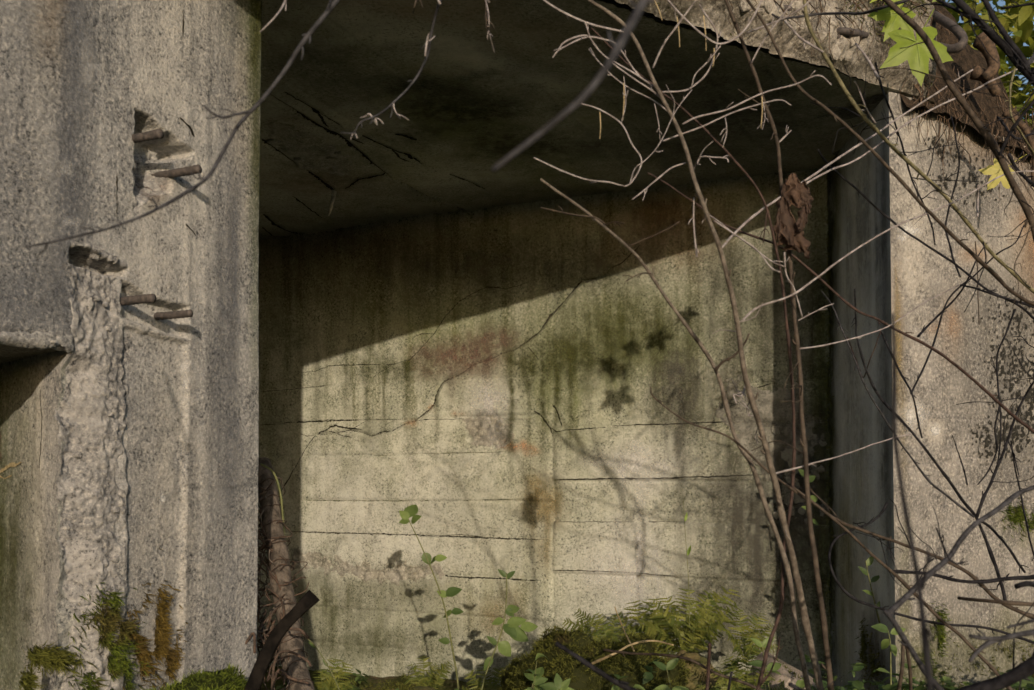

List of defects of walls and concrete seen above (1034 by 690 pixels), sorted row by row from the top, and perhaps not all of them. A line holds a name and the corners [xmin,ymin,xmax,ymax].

spalling [136,164,202,194]
crack [262,90,421,190]
crack [261,245,640,491]
water stain [528,347,573,414]
spalling [0,241,193,690]
crack [310,496,429,504]